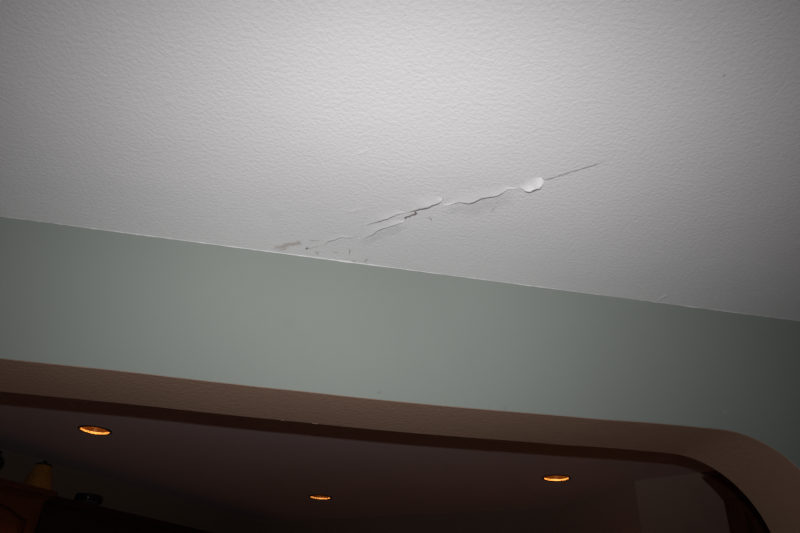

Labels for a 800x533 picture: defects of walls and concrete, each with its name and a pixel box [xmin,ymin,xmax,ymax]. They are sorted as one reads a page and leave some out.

peeling [320,177,544,247]